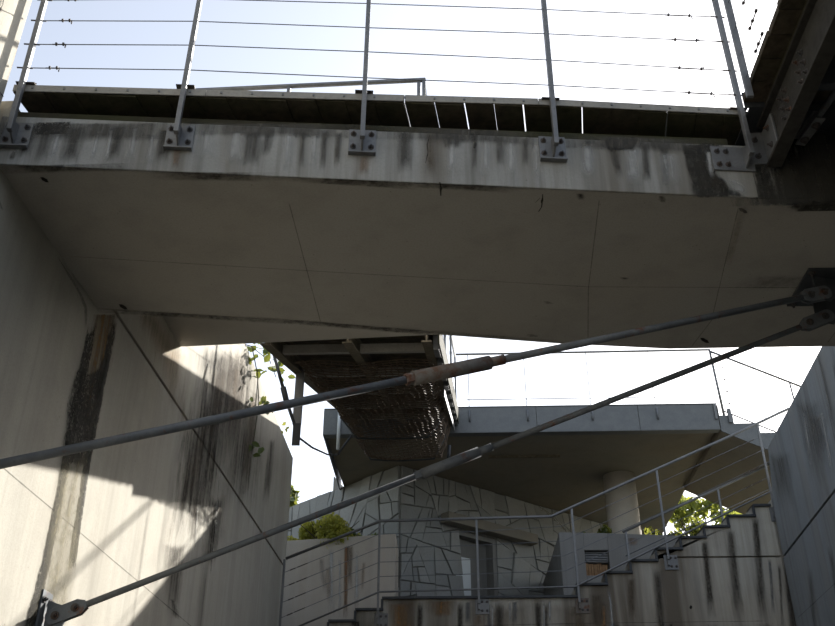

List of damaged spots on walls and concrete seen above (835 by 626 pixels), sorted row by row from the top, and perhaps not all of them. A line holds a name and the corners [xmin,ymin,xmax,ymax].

damp [10,122,167,158]
damp [181,172,249,180]
damp [222,124,341,160]
damp [324,179,388,187]
damp [429,129,537,169]
damp [583,136,743,197]
damp [751,134,835,205]
damp [26,315,115,626]
damp [181,354,257,566]
damp [655,575,672,626]
damp [702,543,713,601]
damp [753,520,794,626]